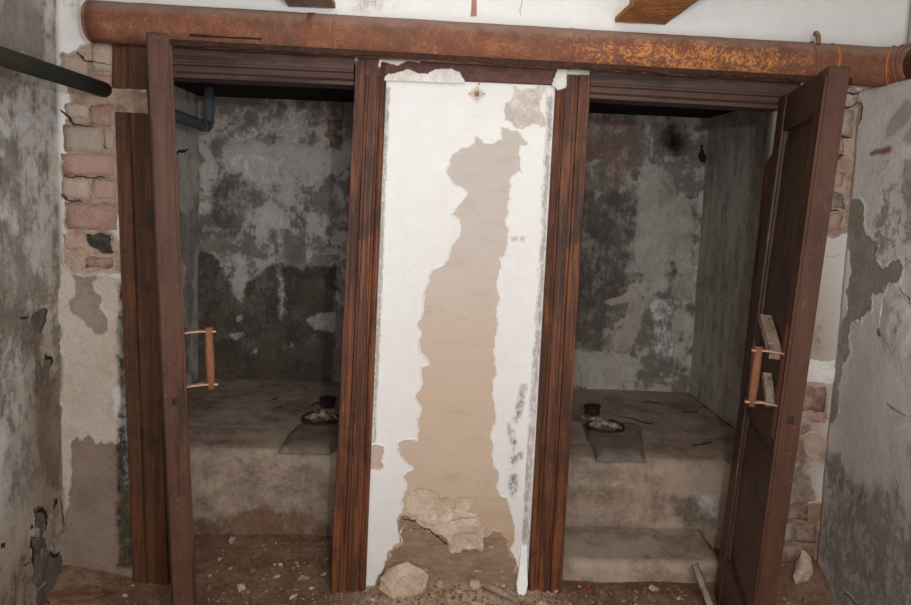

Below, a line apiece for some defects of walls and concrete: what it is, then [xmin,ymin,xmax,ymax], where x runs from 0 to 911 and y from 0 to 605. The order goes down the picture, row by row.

corrosion [306,12,314,33]
water stain [0,110,57,140]
spalling [59,42,148,336]
water stain [198,109,337,382]
peeling [371,85,549,586]
water stain [576,190,638,347]
peeling [800,86,906,465]
crack [878,286,911,328]
spalling [28,498,66,605]
water stain [820,455,911,605]